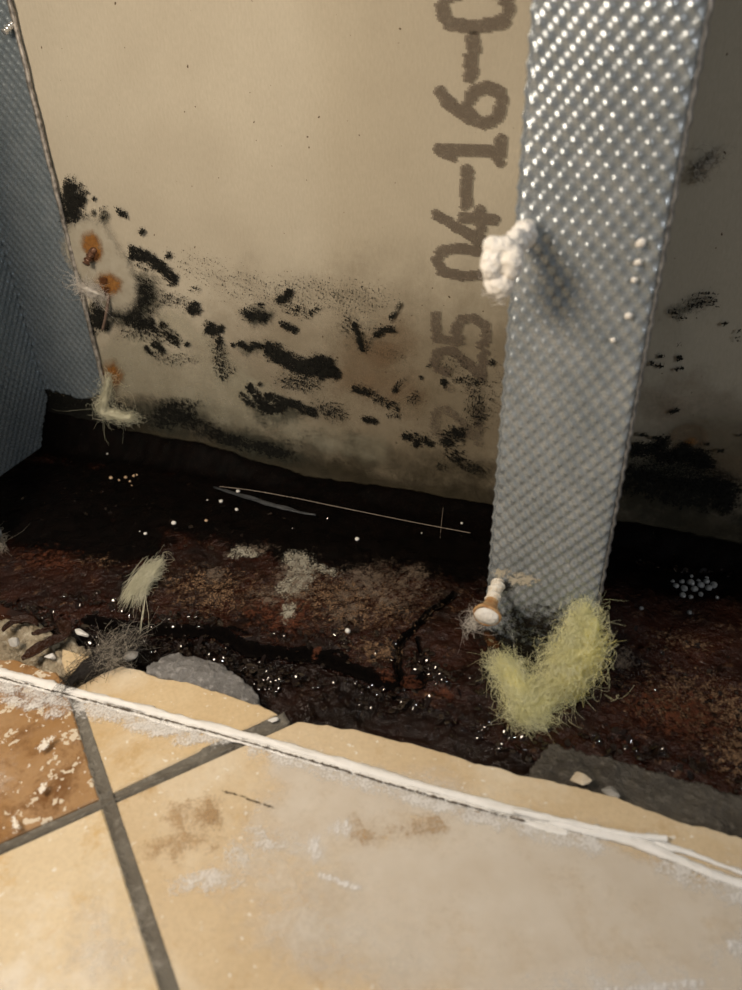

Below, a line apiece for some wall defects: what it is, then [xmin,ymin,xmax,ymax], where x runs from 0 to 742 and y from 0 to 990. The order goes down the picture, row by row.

mould [57,174,128,230]
leakage [45,226,504,505]
leakage [616,433,742,544]
corrosion [1,614,70,661]
crack [80,590,458,692]
corrosion [153,560,442,689]
leakage [0,682,198,745]
corrosion [586,627,742,786]